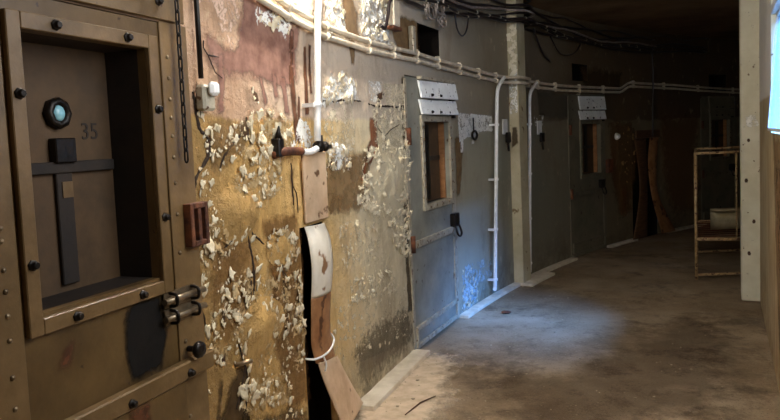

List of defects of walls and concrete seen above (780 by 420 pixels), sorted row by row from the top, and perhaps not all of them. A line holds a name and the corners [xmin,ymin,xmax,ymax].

peeling [198,86,307,420]
peeling [255,6,292,37]
peeling [325,140,352,177]
peeling [321,70,359,108]
peeling [333,92,414,360]
damp [355,196,412,385]